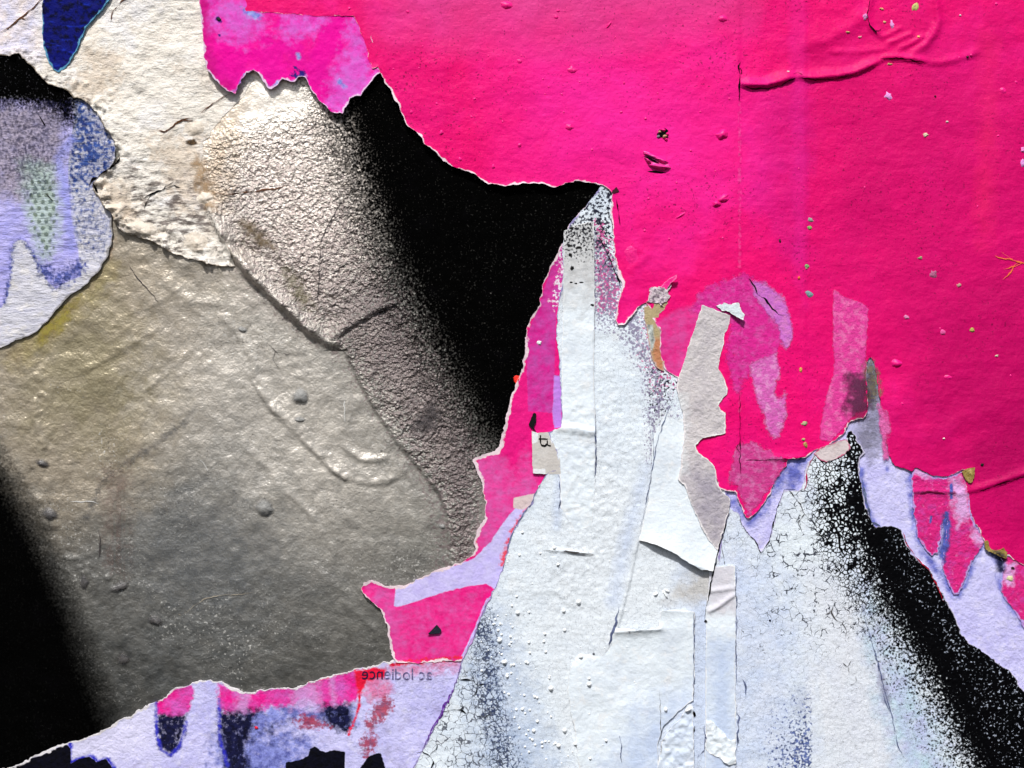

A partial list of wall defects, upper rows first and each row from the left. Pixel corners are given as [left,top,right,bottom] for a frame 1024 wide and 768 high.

crack [749,279,778,314]
crack [790,480,881,556]